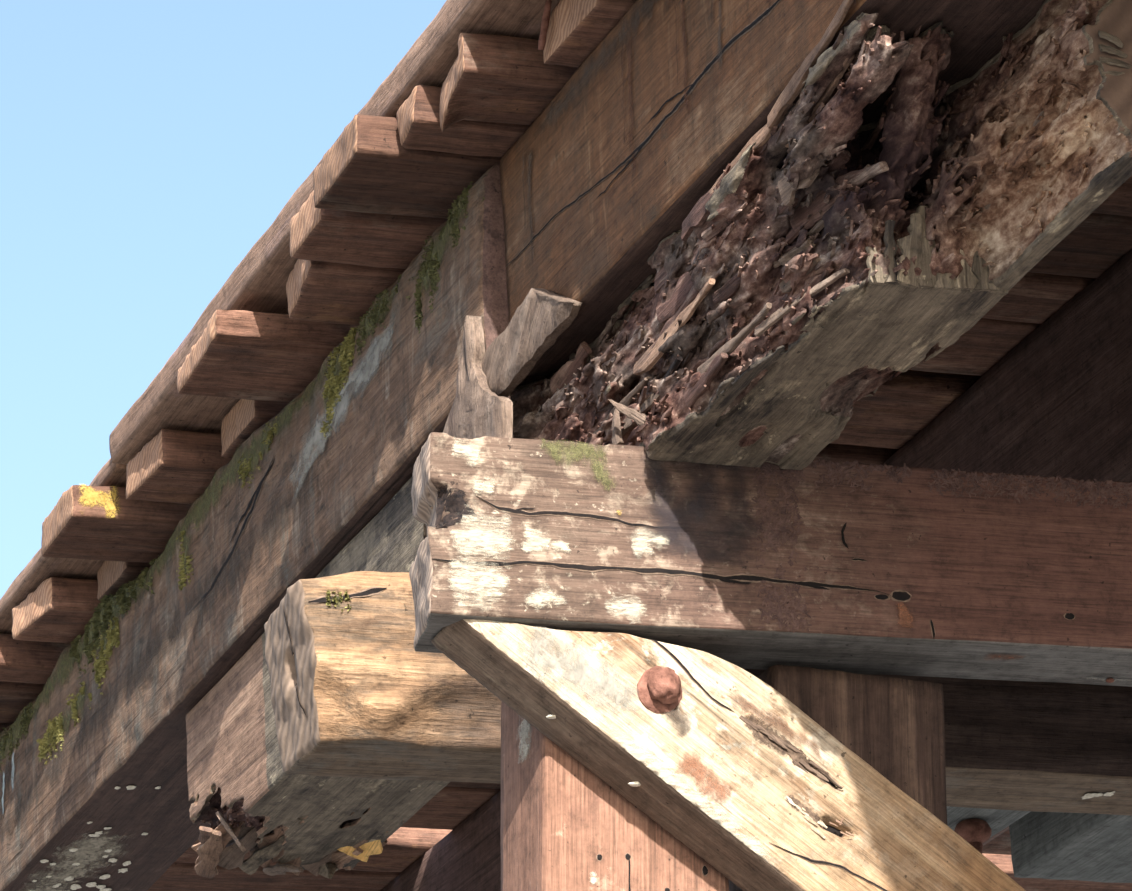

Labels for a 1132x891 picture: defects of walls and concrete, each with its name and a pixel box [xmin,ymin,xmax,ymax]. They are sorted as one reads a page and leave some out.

peeling [865,206,1009,295]
peeling [608,399,647,445]
crack [184,454,275,619]
crack [473,493,683,530]
crack [432,522,891,596]
crack [284,587,387,656]
crack [296,683,308,719]
crack [650,639,734,712]
peeling [191,811,285,878]
peeling [335,839,388,870]
crack [769,842,888,891]